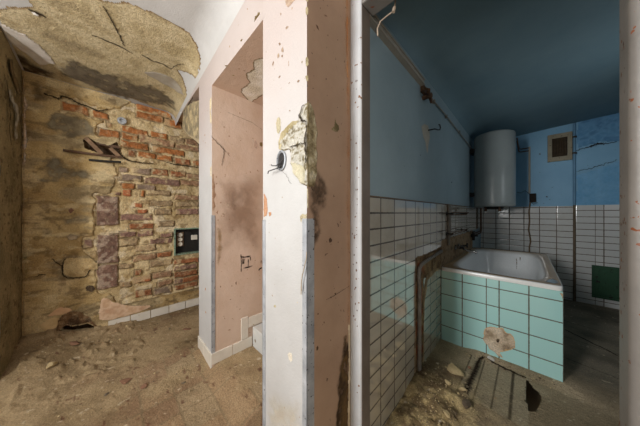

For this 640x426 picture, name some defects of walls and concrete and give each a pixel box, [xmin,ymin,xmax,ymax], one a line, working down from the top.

crack [94,6,181,69]
crack [43,93,108,111]
leakage [61,61,174,106]
peeling [241,58,263,102]
flaking render [0,0,206,305]
spalling [276,102,318,221]
spalling [483,327,515,358]
leakage [336,338,349,426]